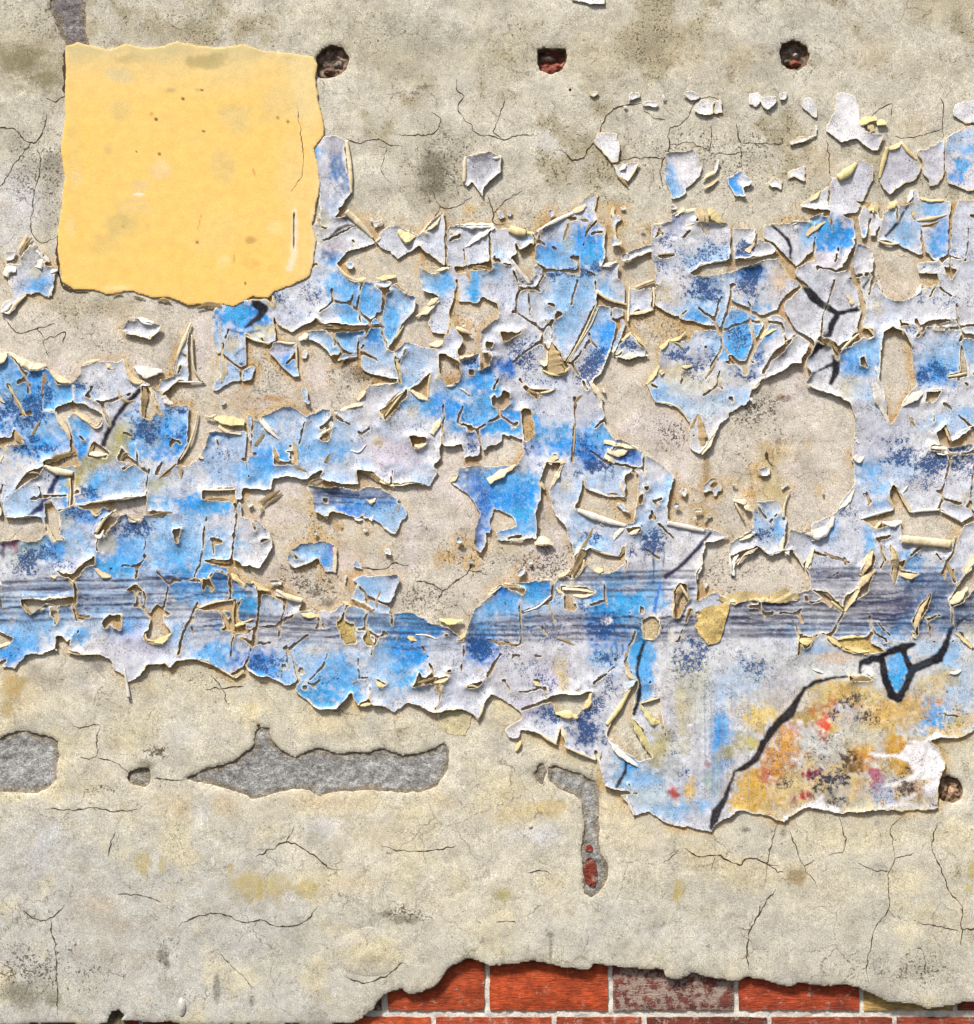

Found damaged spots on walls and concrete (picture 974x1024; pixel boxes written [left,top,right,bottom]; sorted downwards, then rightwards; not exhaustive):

crack [0,50,88,294]
crack [348,80,528,178]
crack [433,191,521,225]
crack [562,96,780,191]
crack [871,100,944,140]
peeling [0,91,974,897]
crack [257,828,336,870]
crack [185,909,316,927]
crack [664,816,974,984]
flaking render [334,959,974,1024]